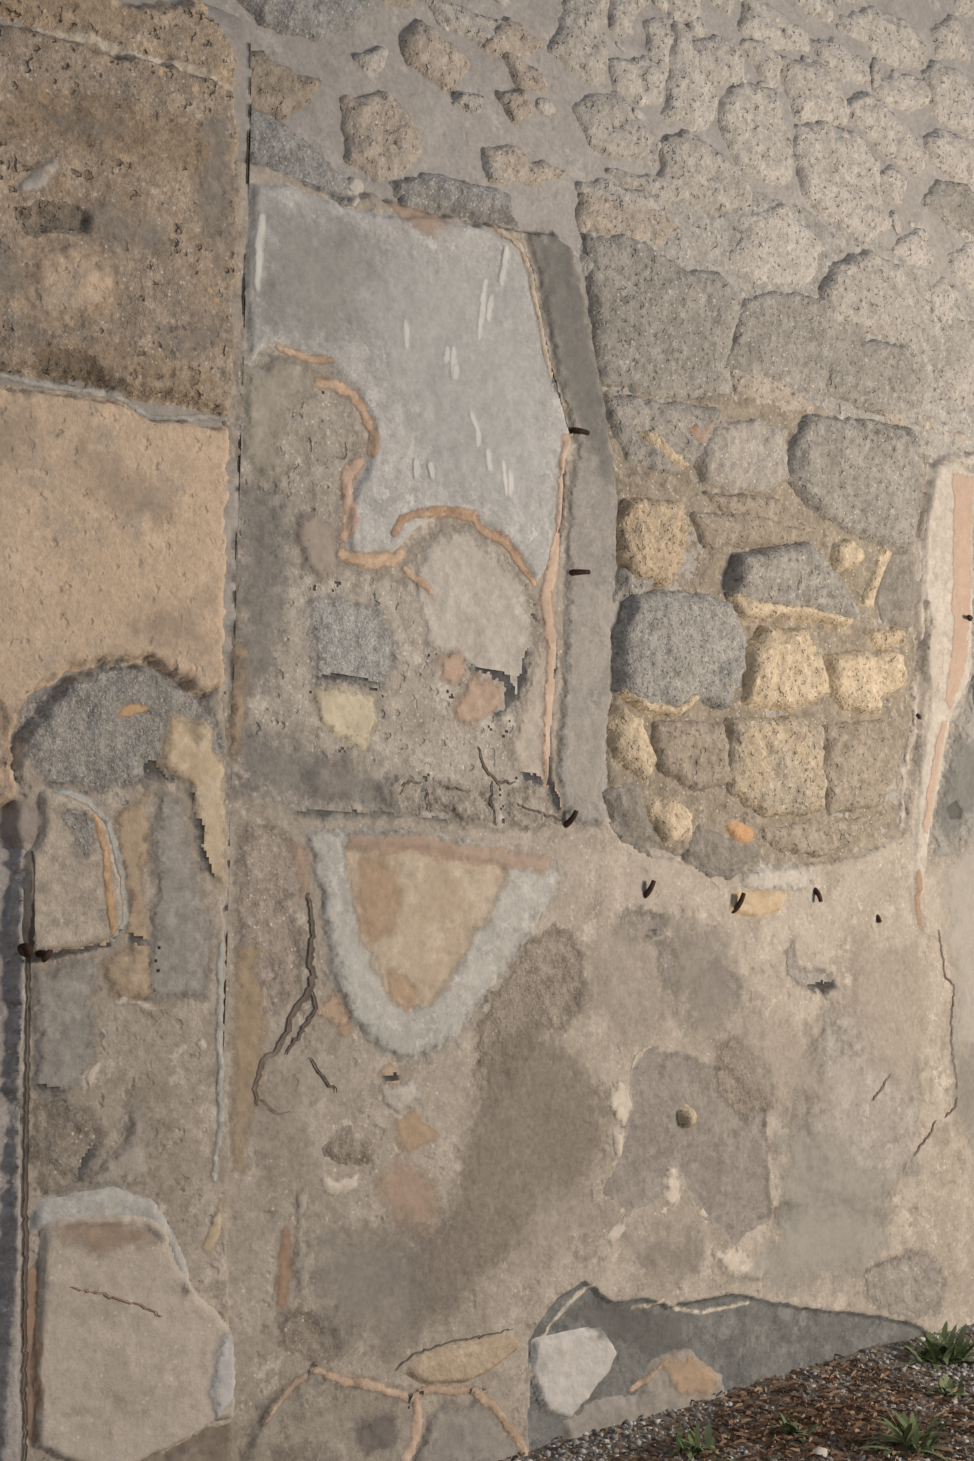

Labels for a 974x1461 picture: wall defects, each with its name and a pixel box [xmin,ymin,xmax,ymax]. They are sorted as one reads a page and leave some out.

spalling [535,98,556,116]
spalling [870,57,880,90]
spalling [889,210,929,242]
spalling [602,389,974,919]
crack [253,893,337,1115]
spalling [402,1033,928,1451]